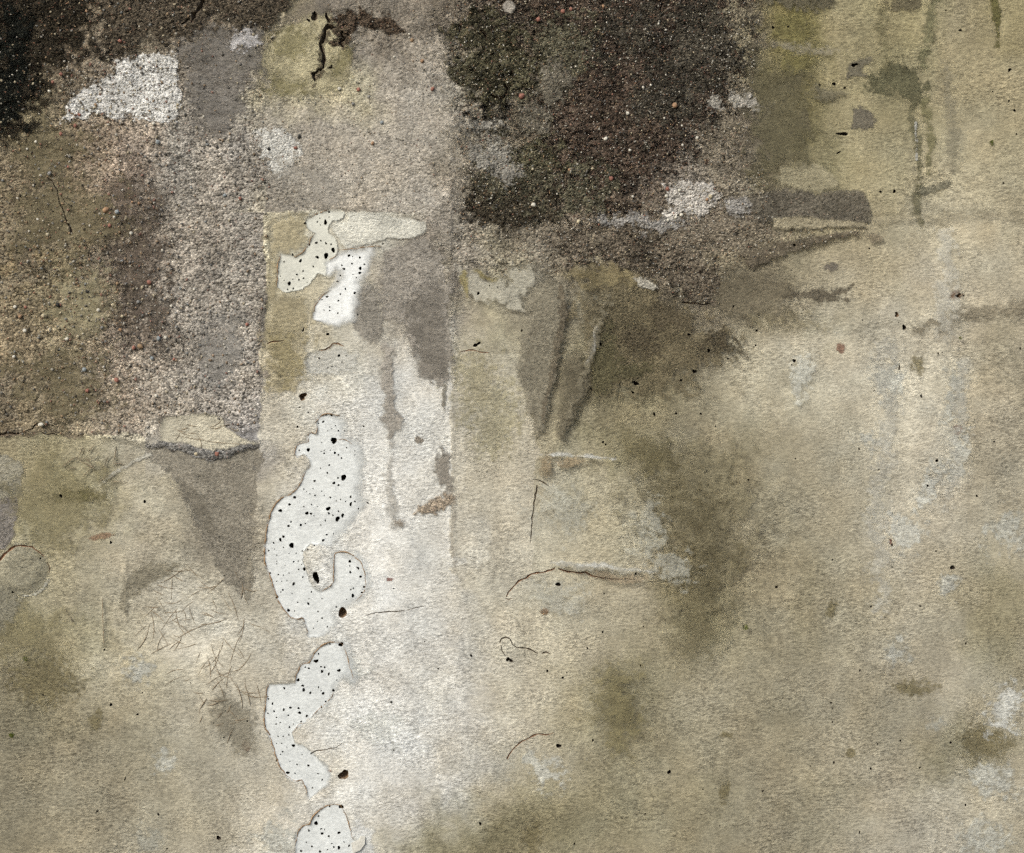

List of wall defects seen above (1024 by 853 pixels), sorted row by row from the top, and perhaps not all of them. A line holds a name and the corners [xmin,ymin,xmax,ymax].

crack [307,11,351,88]
damp [885,0,939,69]
damp [908,89,936,225]
spalling [0,0,857,461]
damp [438,0,883,460]
damp [353,238,454,438]
peeling [263,392,369,798]
crack [506,568,635,600]
peeling [295,804,366,853]